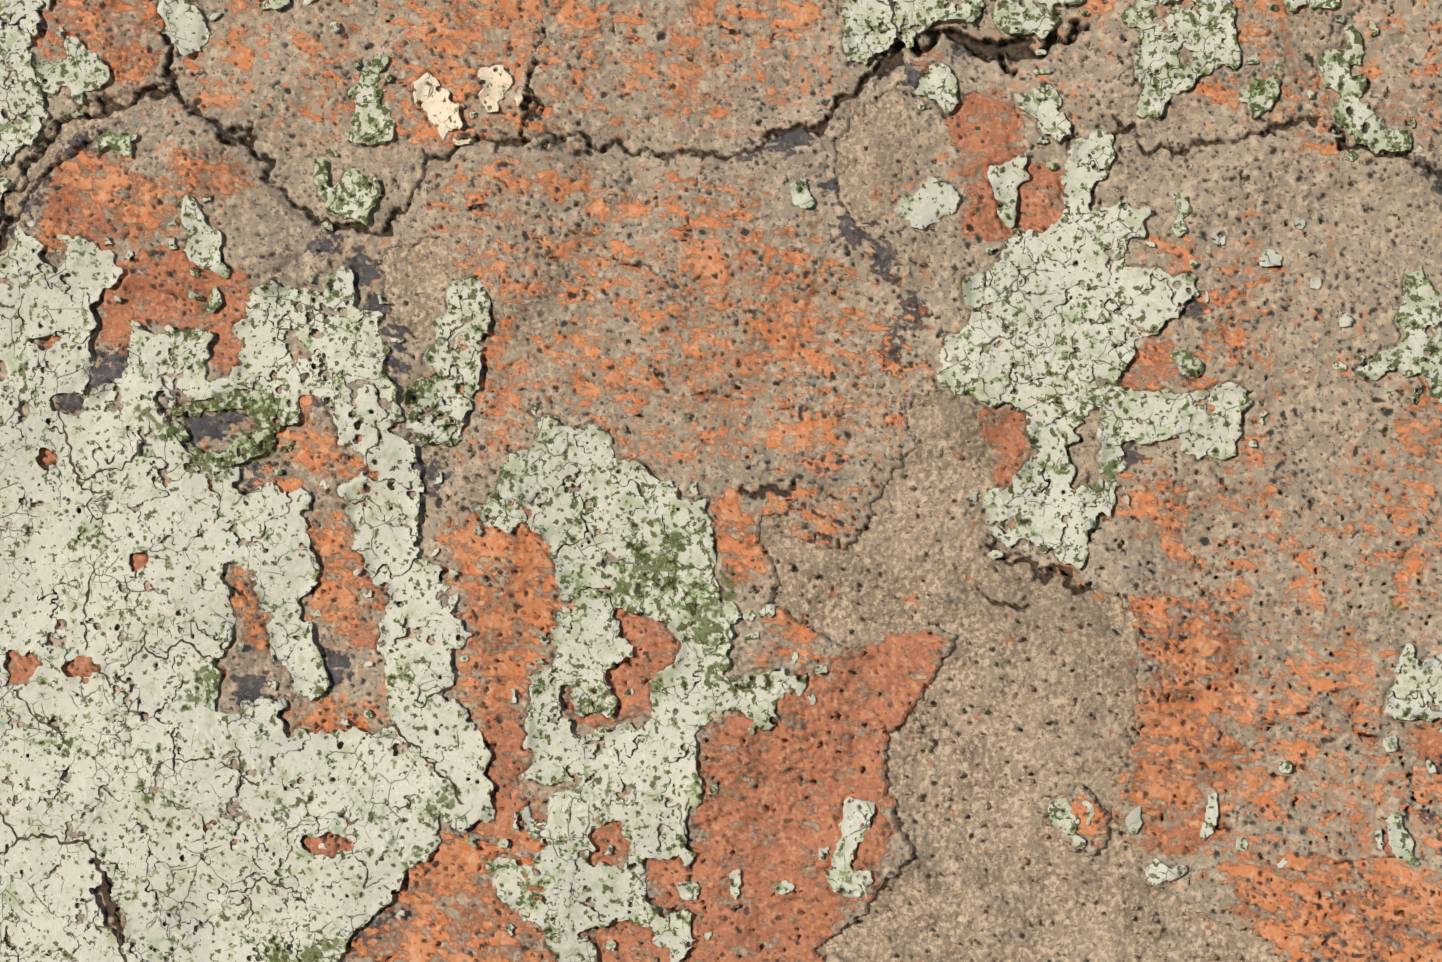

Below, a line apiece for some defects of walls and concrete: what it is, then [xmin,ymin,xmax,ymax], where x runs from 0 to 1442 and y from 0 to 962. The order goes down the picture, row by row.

peeling [306,145,382,242]
peeling [335,50,523,172]
crack [0,0,1090,252]
spalling [778,55,976,244]
crack [1112,114,1442,179]
peeling [1314,266,1442,454]
crack [56,402,139,524]
crack [82,563,212,688]
crack [392,687,464,805]
crack [0,812,127,962]
peeling [1200,789,1230,840]
peeling [1374,800,1432,867]